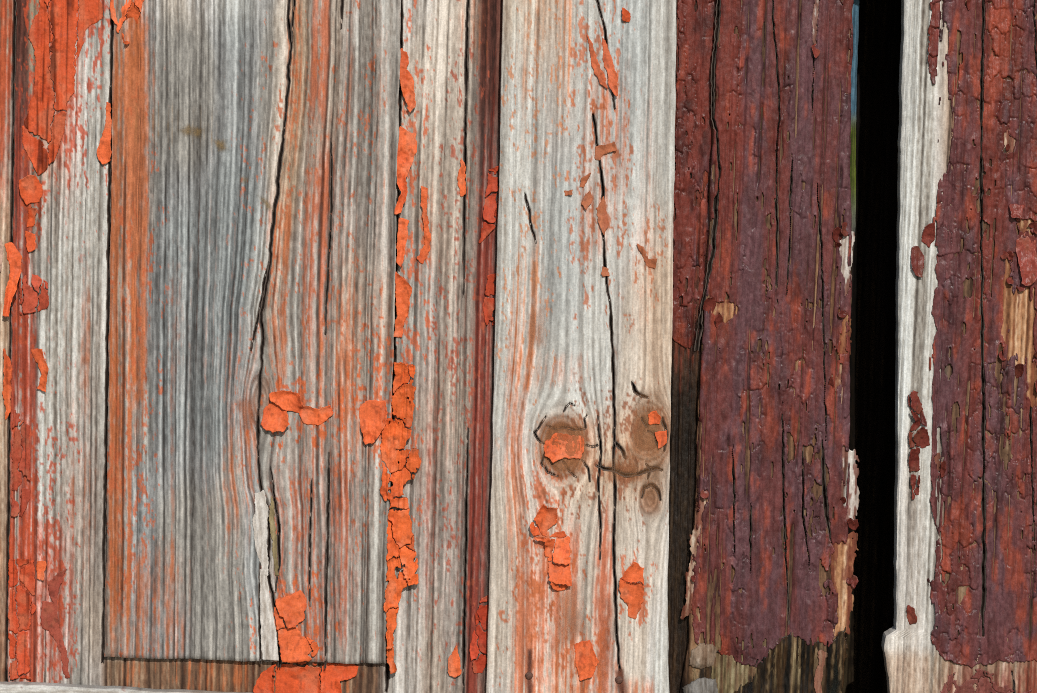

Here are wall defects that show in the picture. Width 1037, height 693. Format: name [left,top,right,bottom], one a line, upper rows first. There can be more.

peeling [0,0,144,317]
crack [250,0,296,668]
crack [325,138,333,334]
peeling [394,126,431,338]
crack [592,92,616,199]
crack [772,0,832,625]
peeling [253,590,358,693]
crack [308,452,330,669]
peeling [359,362,421,674]
crack [533,233,668,671]
peeling [829,447,859,636]
peeling [908,390,946,500]